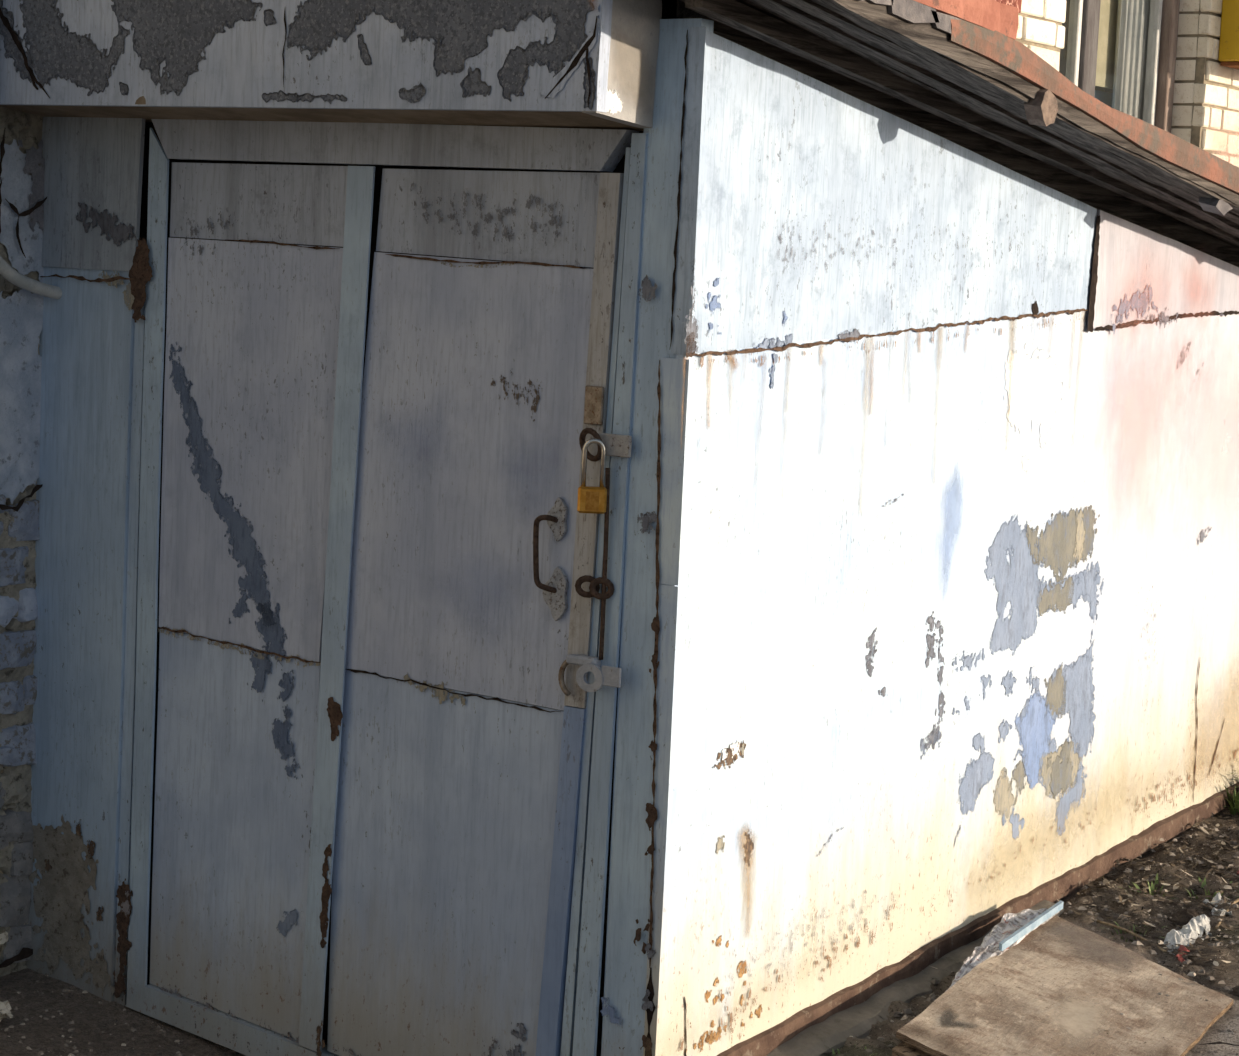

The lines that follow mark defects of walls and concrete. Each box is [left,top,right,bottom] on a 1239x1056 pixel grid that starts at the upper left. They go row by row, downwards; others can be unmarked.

peeling [0,0,623,114]
peeling [0,139,45,504]
crack [0,129,132,288]
corrosion [122,237,155,323]
corrosion [684,286,1087,372]
peeling [169,344,303,780]
peeling [921,505,1104,847]
peeling [29,814,114,996]
corrosion [113,879,133,1001]
corrosion [319,844,332,948]
corrosion [741,831,754,908]
corrosion [669,895,900,1052]